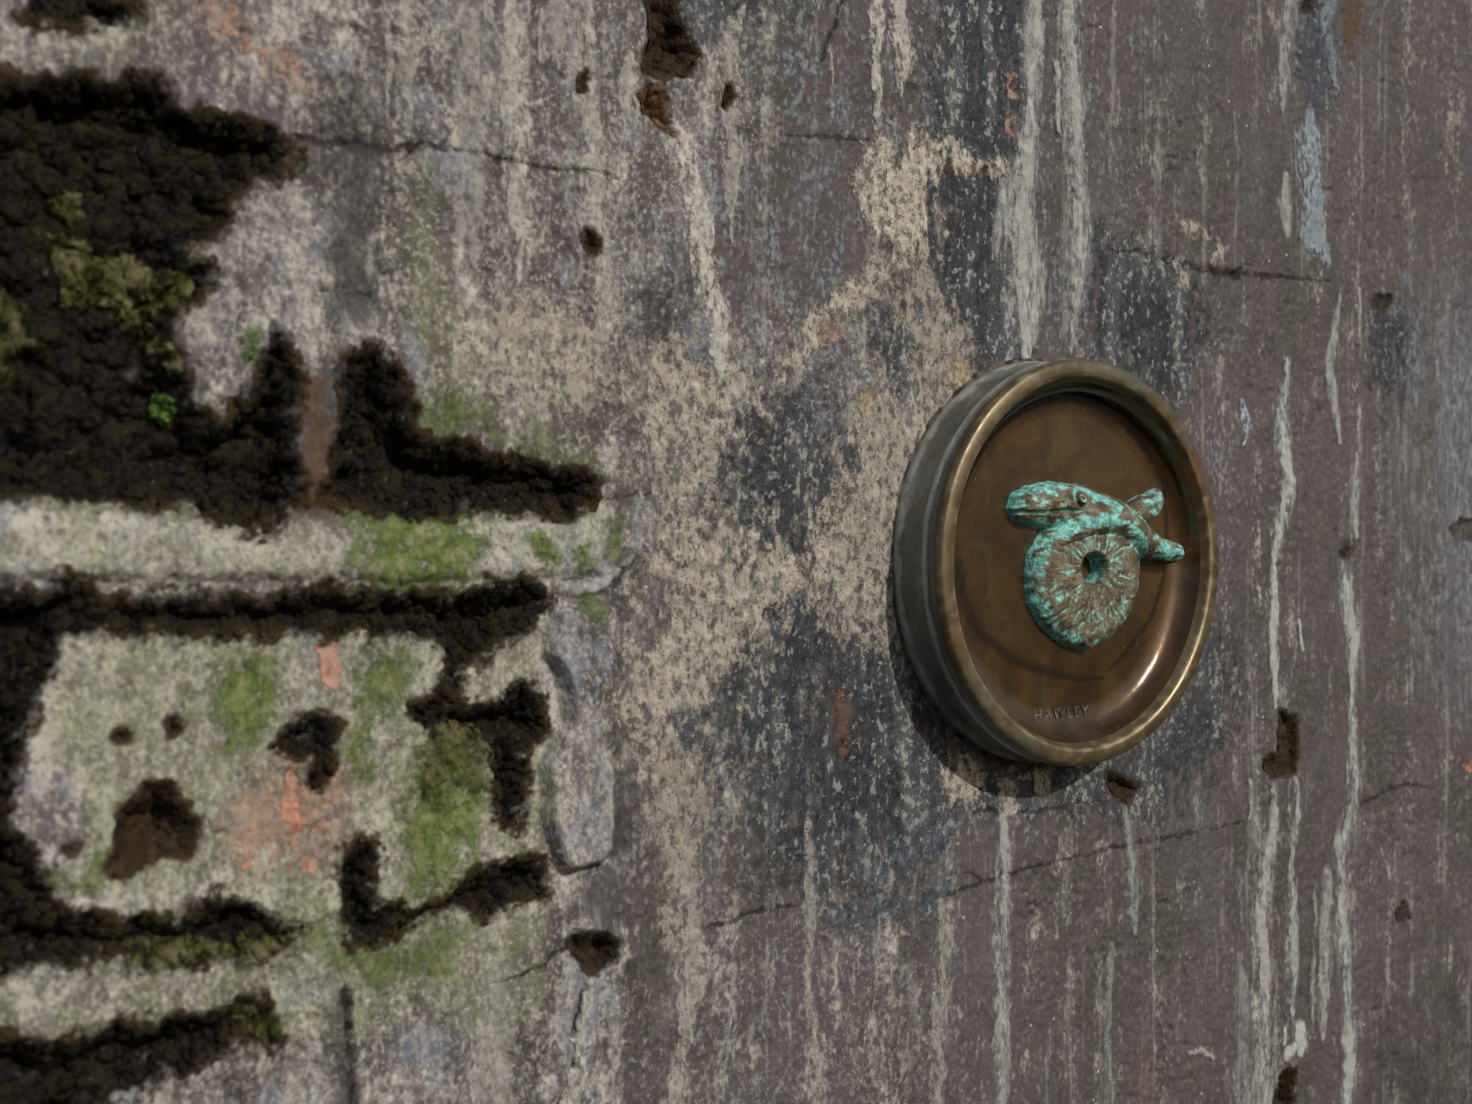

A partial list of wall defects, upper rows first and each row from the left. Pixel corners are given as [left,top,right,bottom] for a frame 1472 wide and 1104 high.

crack [291,133,626,181]
crack [1091,248,1331,283]
damp [658,0,1248,1104]
efflorescence [1269,357,1296,709]
hole [1449,518,1472,543]
hole [1263,708,1301,781]
crack [947,821,1241,896]
efflorescence [1253,562,1362,1104]
crack [705,903,796,930]
hole [565,930,623,978]
crack [340,984,358,1104]
hole [1272,1066,1298,1104]